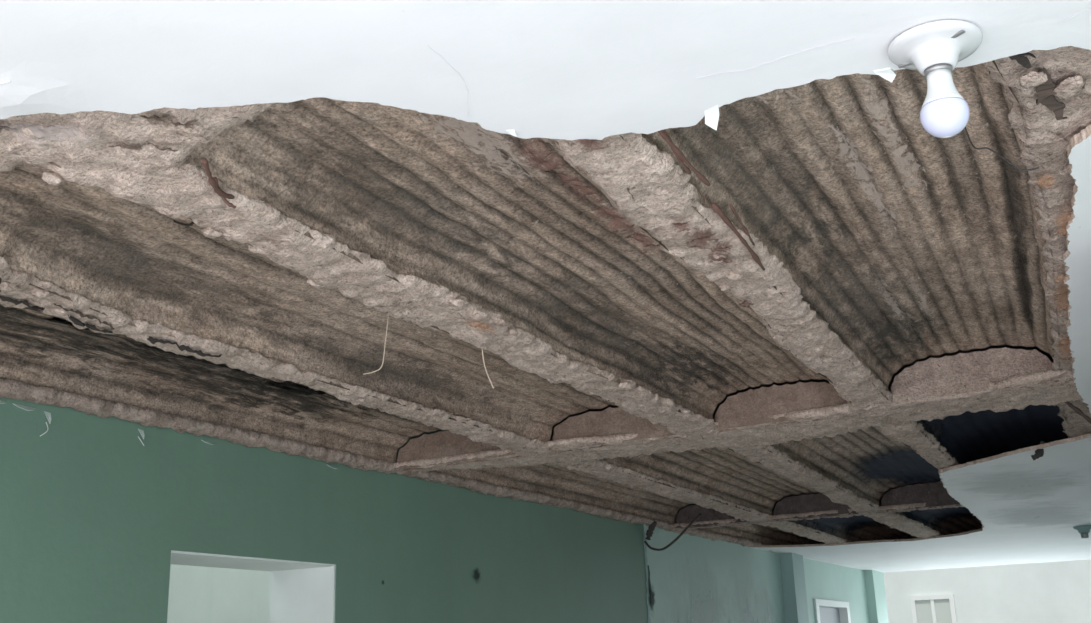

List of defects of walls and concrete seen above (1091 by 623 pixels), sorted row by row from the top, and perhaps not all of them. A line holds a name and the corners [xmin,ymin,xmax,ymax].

peeling [874,68,896,82]
spalling [1019,66,1086,120]
spalling [140,115,198,128]
peeling [705,105,720,131]
spalling [108,142,178,152]
spalling [658,129,710,186]
spalling [201,158,236,209]
rust [521,139,660,254]
rust [673,221,732,266]
spalling [711,203,765,271]
peeling [0,401,51,436]
spalling [1031,441,1046,460]